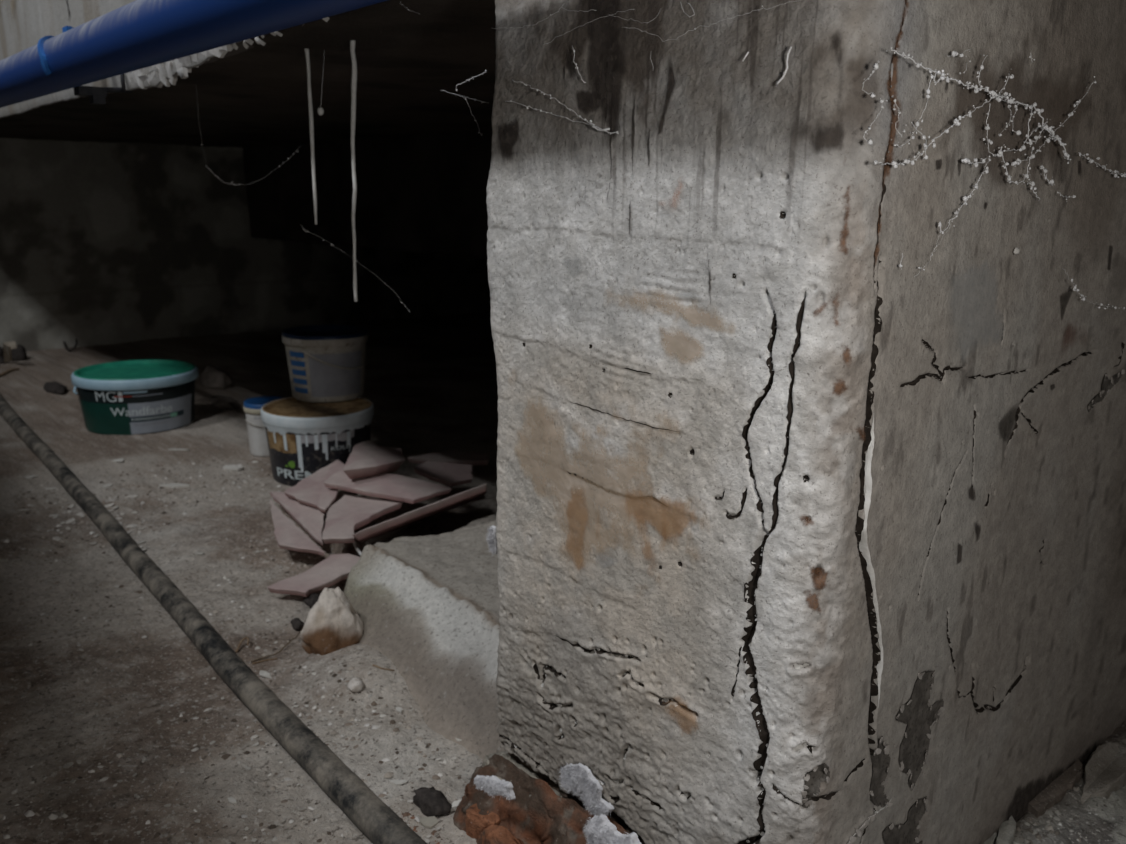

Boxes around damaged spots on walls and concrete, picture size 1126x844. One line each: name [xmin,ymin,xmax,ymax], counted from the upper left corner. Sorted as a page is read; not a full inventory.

crack [715,9,1091,844]
damp [474,775,516,800]
damp [559,762,642,844]
peeling [869,670,945,844]